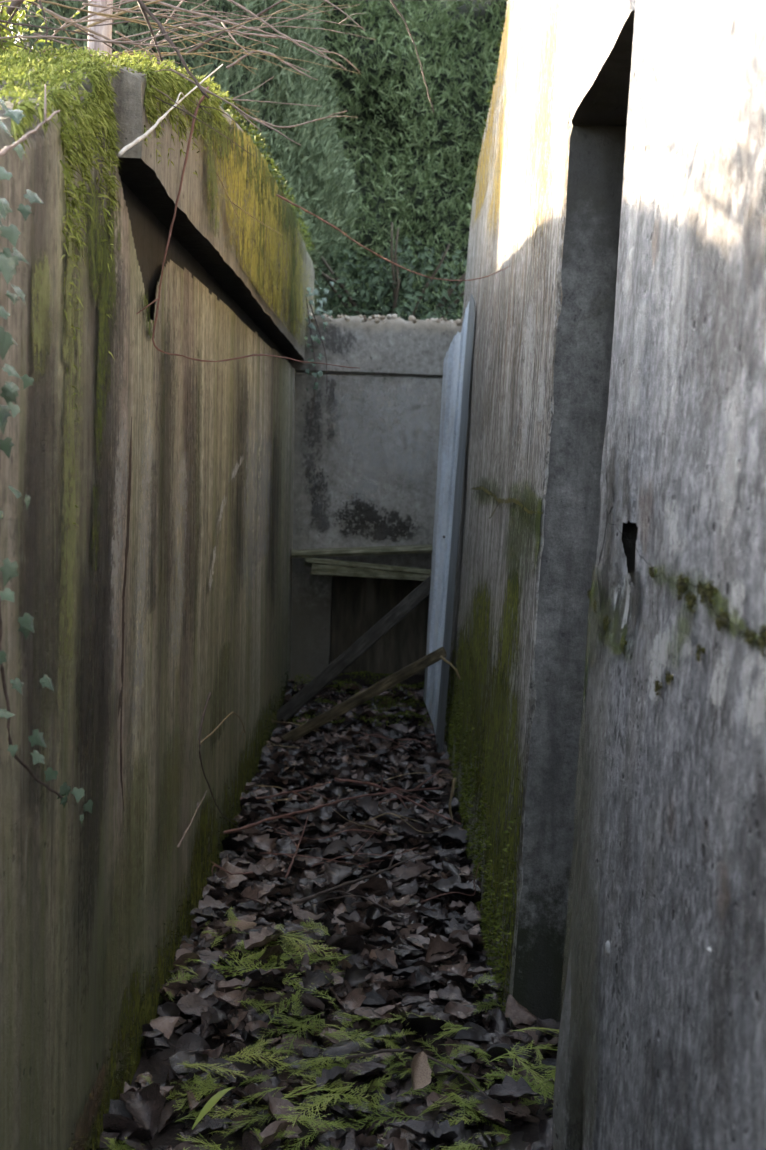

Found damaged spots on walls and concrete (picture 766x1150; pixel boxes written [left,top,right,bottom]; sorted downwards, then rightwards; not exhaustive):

water stain [32,183,104,378]
water stain [322,323,358,354]
water stain [303,379,419,542]
water stain [519,299,545,464]
water stain [76,262,126,974]
water stain [447,482,542,1021]